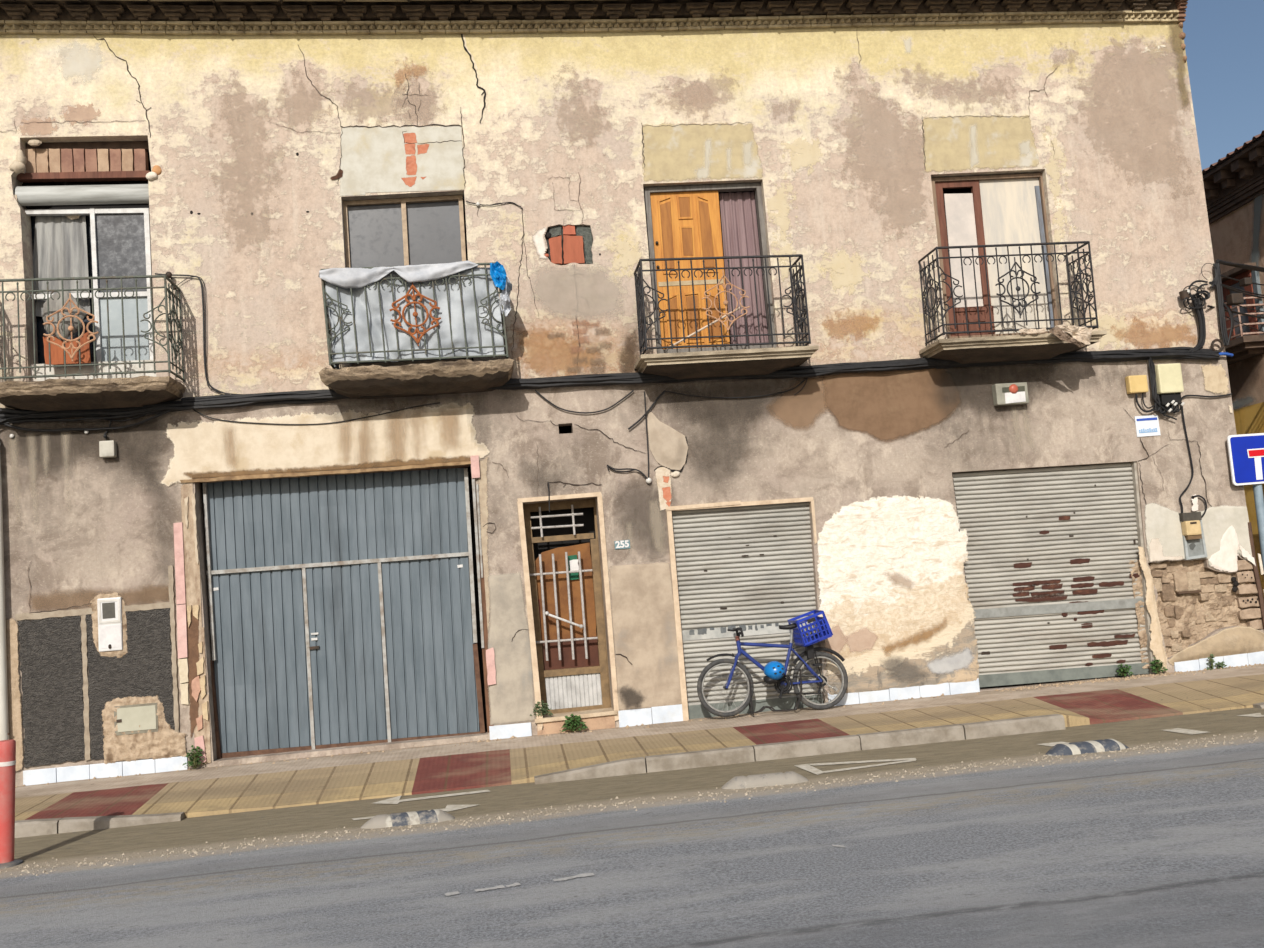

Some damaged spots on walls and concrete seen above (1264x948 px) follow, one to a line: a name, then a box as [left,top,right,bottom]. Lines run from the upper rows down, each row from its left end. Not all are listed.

crack [0,35,151,137]
crack [268,34,539,347]
flaking render [402,133,429,187]
crack [549,172,583,227]
crack [922,68,1057,166]
flaking render [532,225,642,278]
corrosion [1013,558,1140,666]
flaking render [1129,539,1263,673]